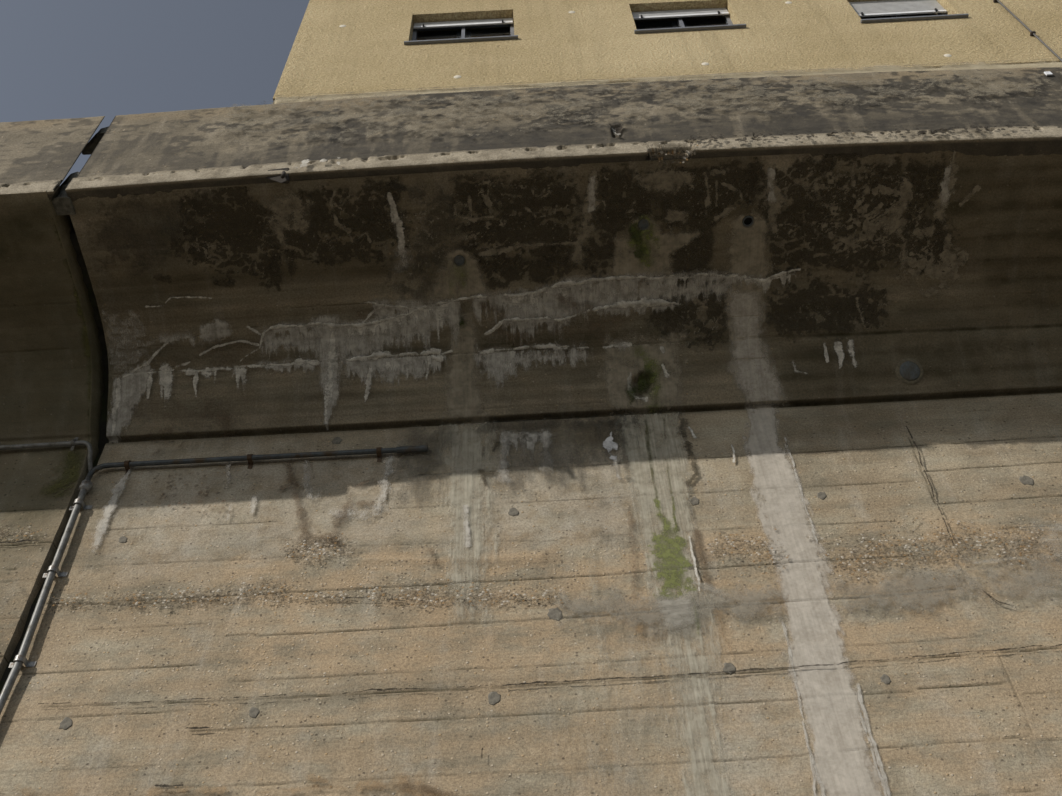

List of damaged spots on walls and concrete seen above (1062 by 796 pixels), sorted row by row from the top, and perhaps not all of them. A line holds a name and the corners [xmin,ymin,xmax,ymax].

water stain [93,467,133,547]
water stain [103,164,890,796]
crack [906,426,962,558]